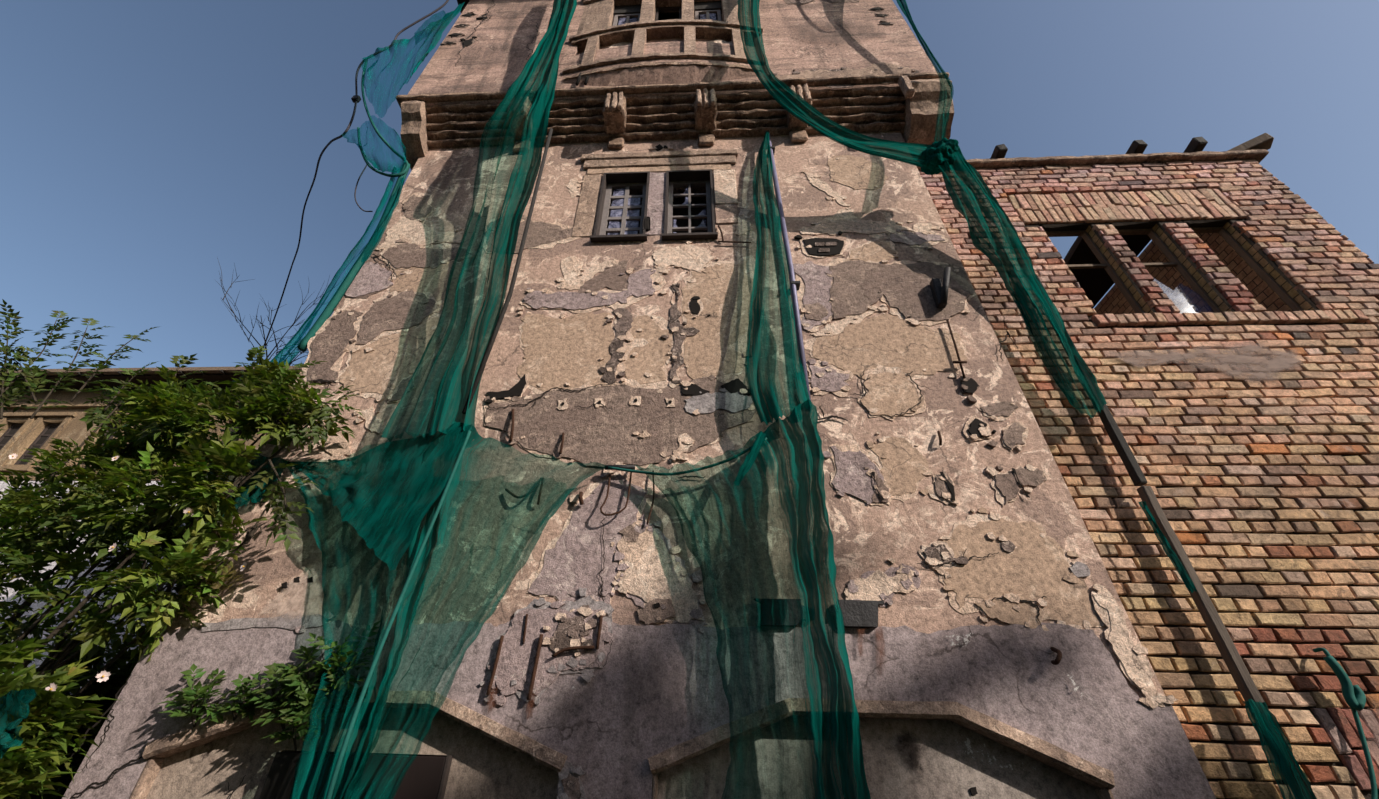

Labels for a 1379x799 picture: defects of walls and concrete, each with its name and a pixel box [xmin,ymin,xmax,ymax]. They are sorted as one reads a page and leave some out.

peeling [302,219,494,384]
peeling [402,192,433,222]
peeling [514,215,583,254]
peeling [792,222,976,334]
peeling [354,369,417,435]
peeling [479,258,756,706]
peeling [823,432,892,506]
spalling [920,373,1048,554]